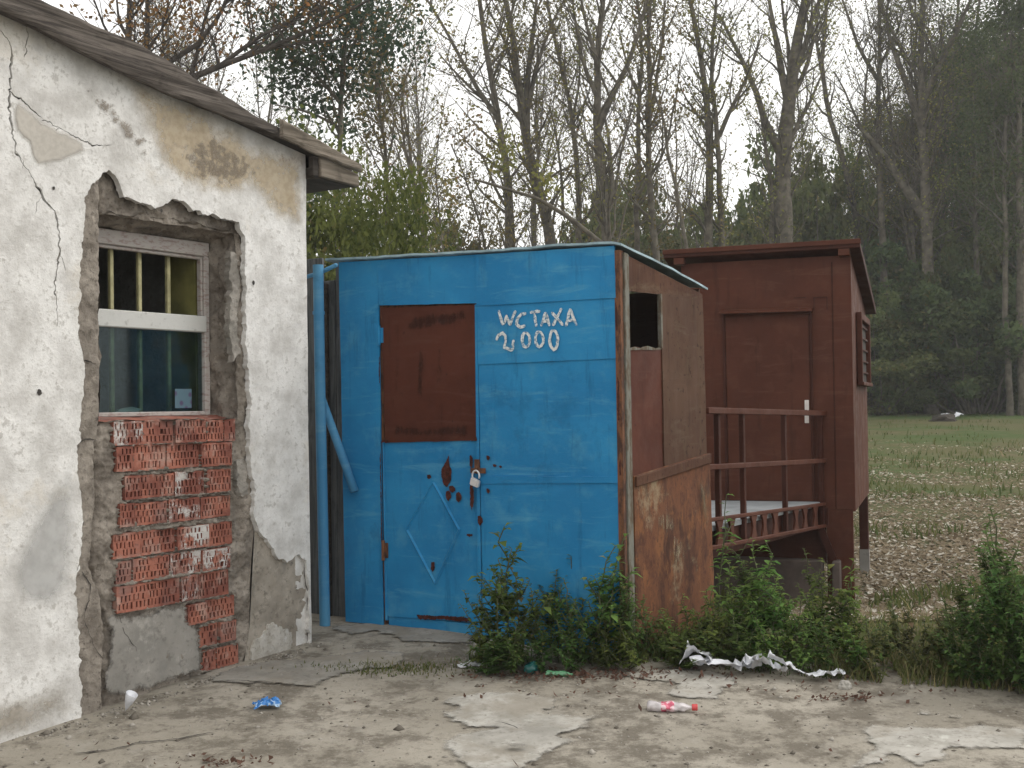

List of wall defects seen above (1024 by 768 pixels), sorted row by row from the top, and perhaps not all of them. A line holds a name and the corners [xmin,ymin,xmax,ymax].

leakage [143,95,297,214]
flaking render [74,172,307,716]
rust [427,455,490,537]